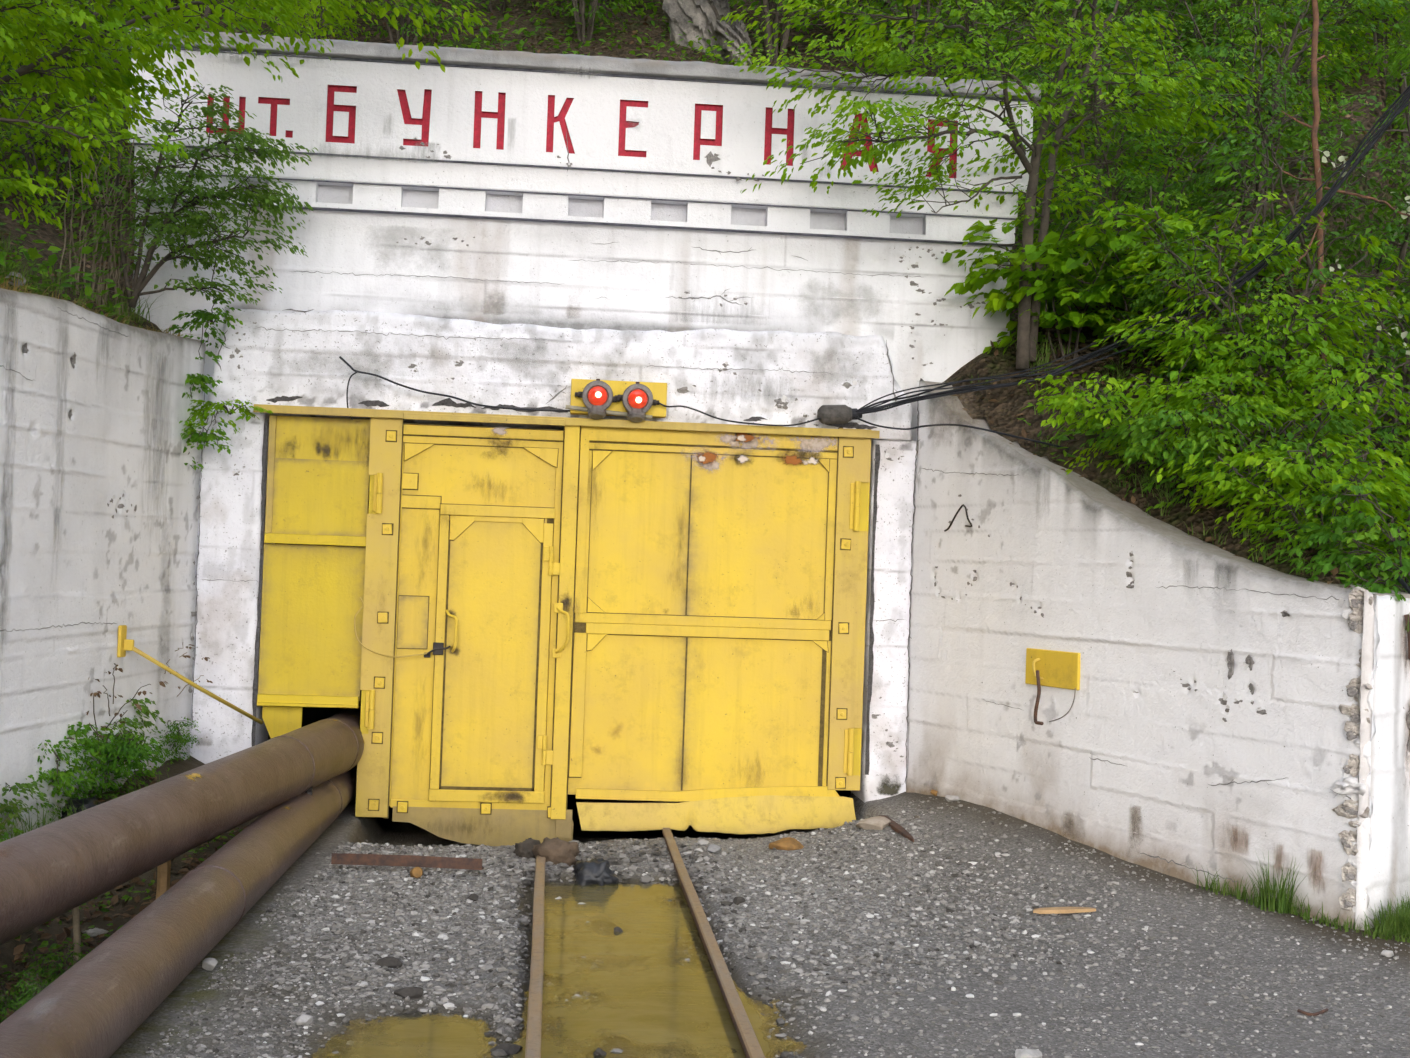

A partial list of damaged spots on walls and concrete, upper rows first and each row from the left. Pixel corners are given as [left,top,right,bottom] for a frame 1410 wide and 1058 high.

spalling [743,389,904,775]
peeling [1219,649,1267,722]
spalling [1338,586,1373,781]
spalling [1331,795,1370,912]